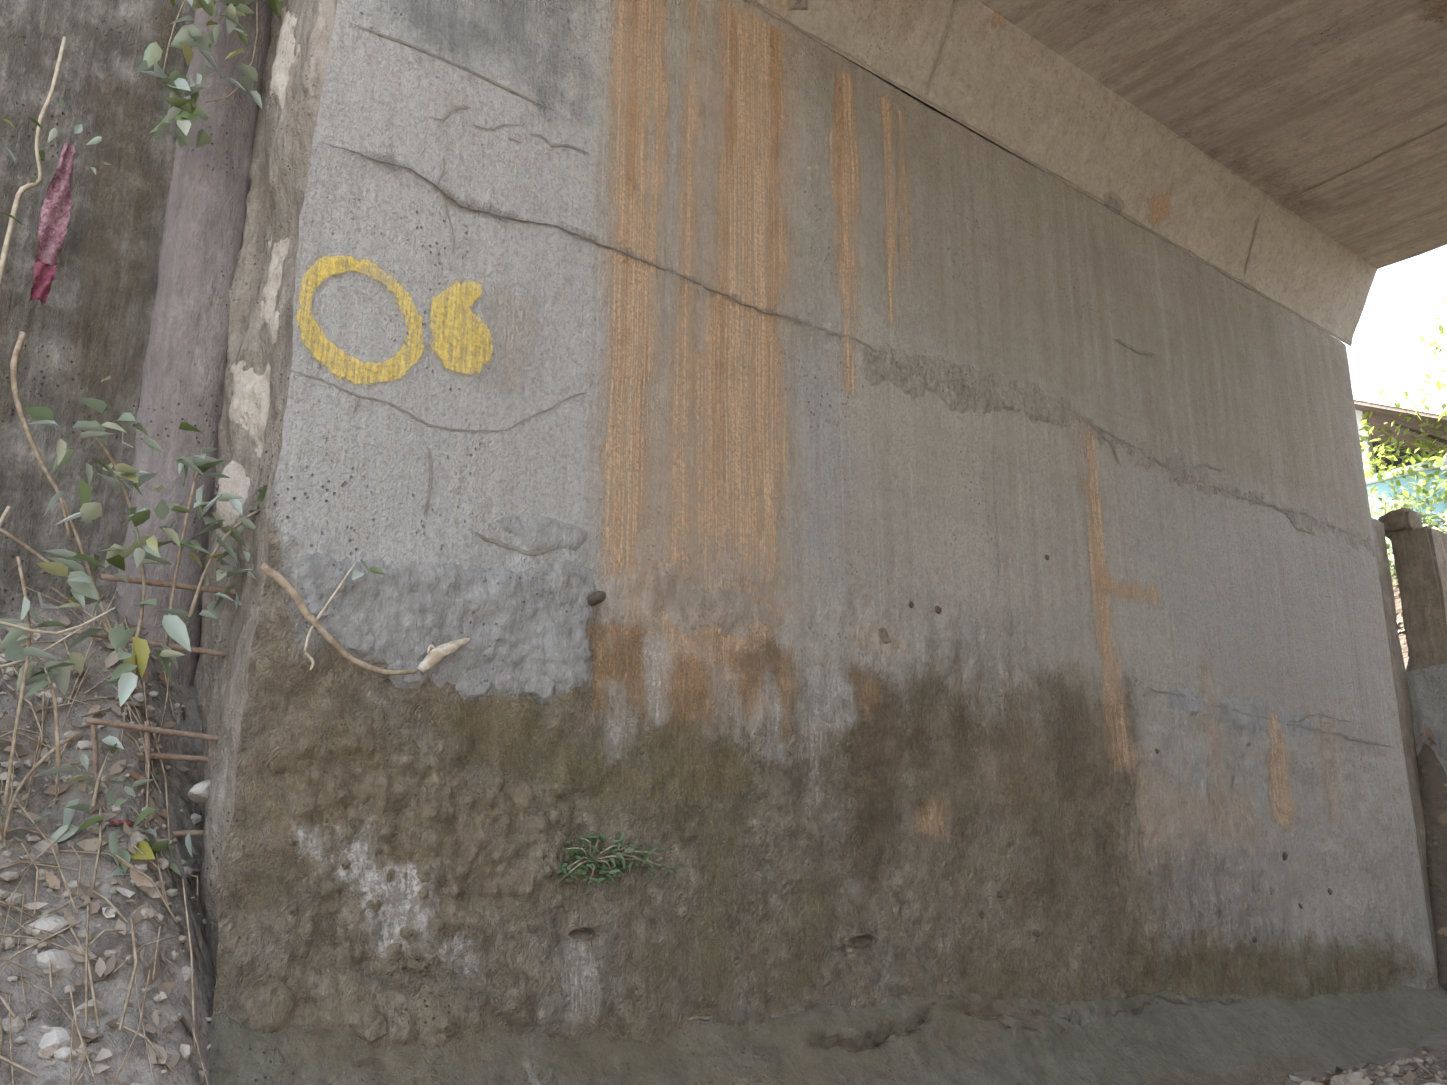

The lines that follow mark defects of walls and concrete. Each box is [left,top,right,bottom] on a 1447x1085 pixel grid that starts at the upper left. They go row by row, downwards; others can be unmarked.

crack [349,22,590,154]
crack [324,143,888,354]
spalling [862,343,1082,428]
crack [1069,410,1369,543]
rust [1075,430,1159,771]
damp [297,825,427,956]
damp [565,941,600,1019]